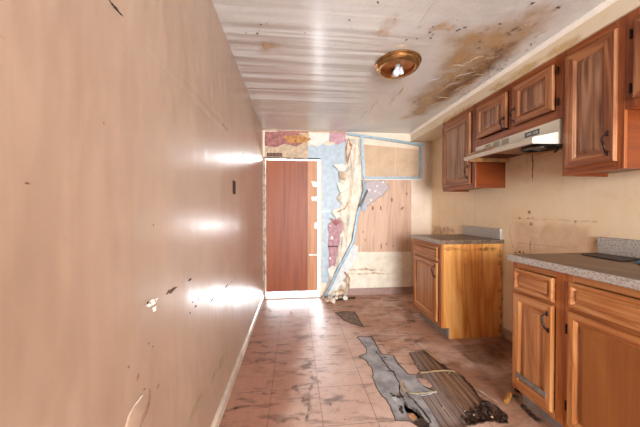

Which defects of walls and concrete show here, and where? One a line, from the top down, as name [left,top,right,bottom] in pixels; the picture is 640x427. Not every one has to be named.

damp [414,23,528,114]
peeling [265,131,311,147]
peeling [329,132,359,194]
peeling [327,201,353,277]